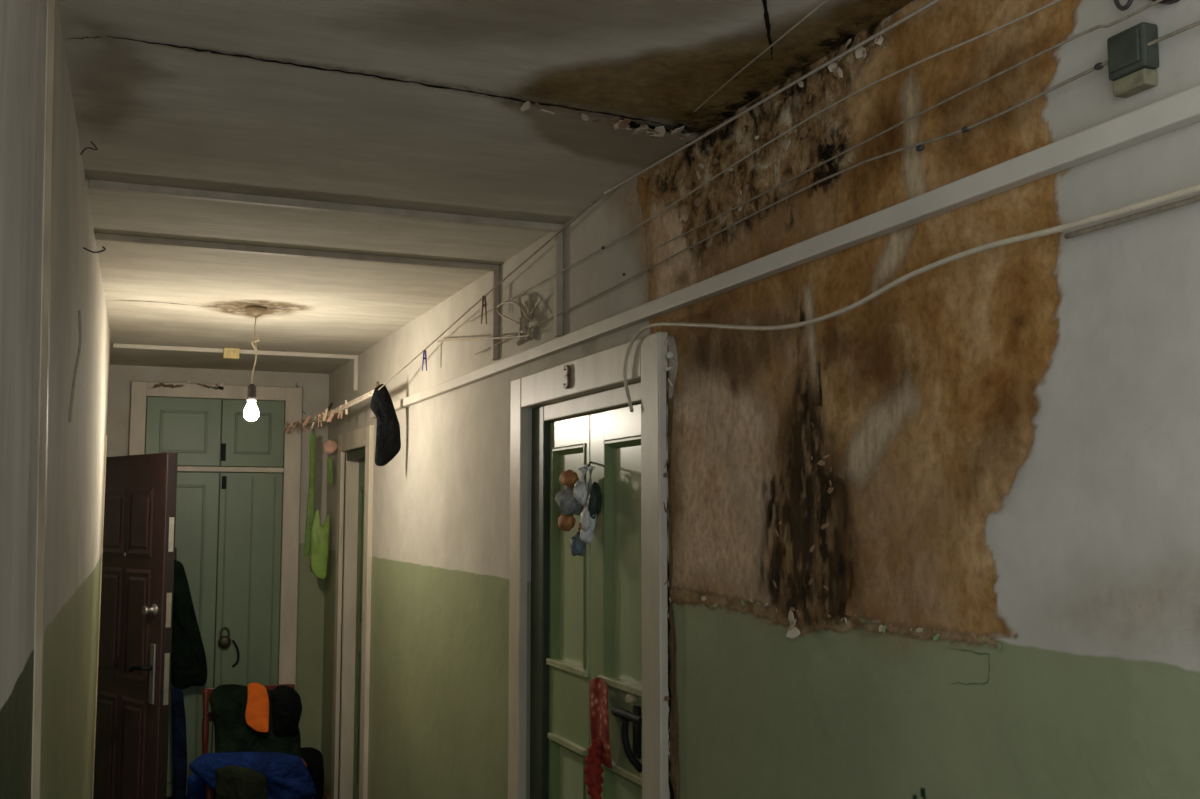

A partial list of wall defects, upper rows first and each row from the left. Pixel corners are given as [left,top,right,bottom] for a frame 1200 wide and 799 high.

crack [70,36,690,140]
spalling [640,20,886,255]
crack [762,0,773,60]
damp [509,0,1081,302]
damp [650,170,1066,644]